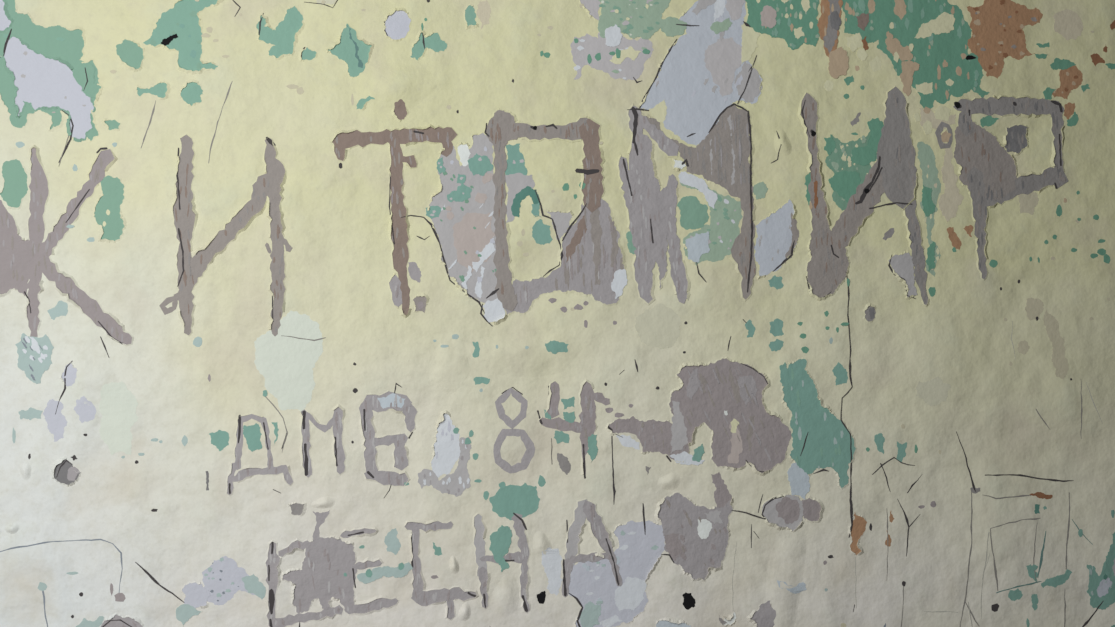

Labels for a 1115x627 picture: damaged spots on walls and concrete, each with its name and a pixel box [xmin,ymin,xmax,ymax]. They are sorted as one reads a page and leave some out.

peeling [330,0,1079,325]
peeling [209,413,279,469]
peeling [332,390,471,497]
spalling [522,318,857,627]
crack [773,240,921,556]
spalling [76,613,144,627]
peeling [176,483,540,627]
peeling [1087,532,1115,610]